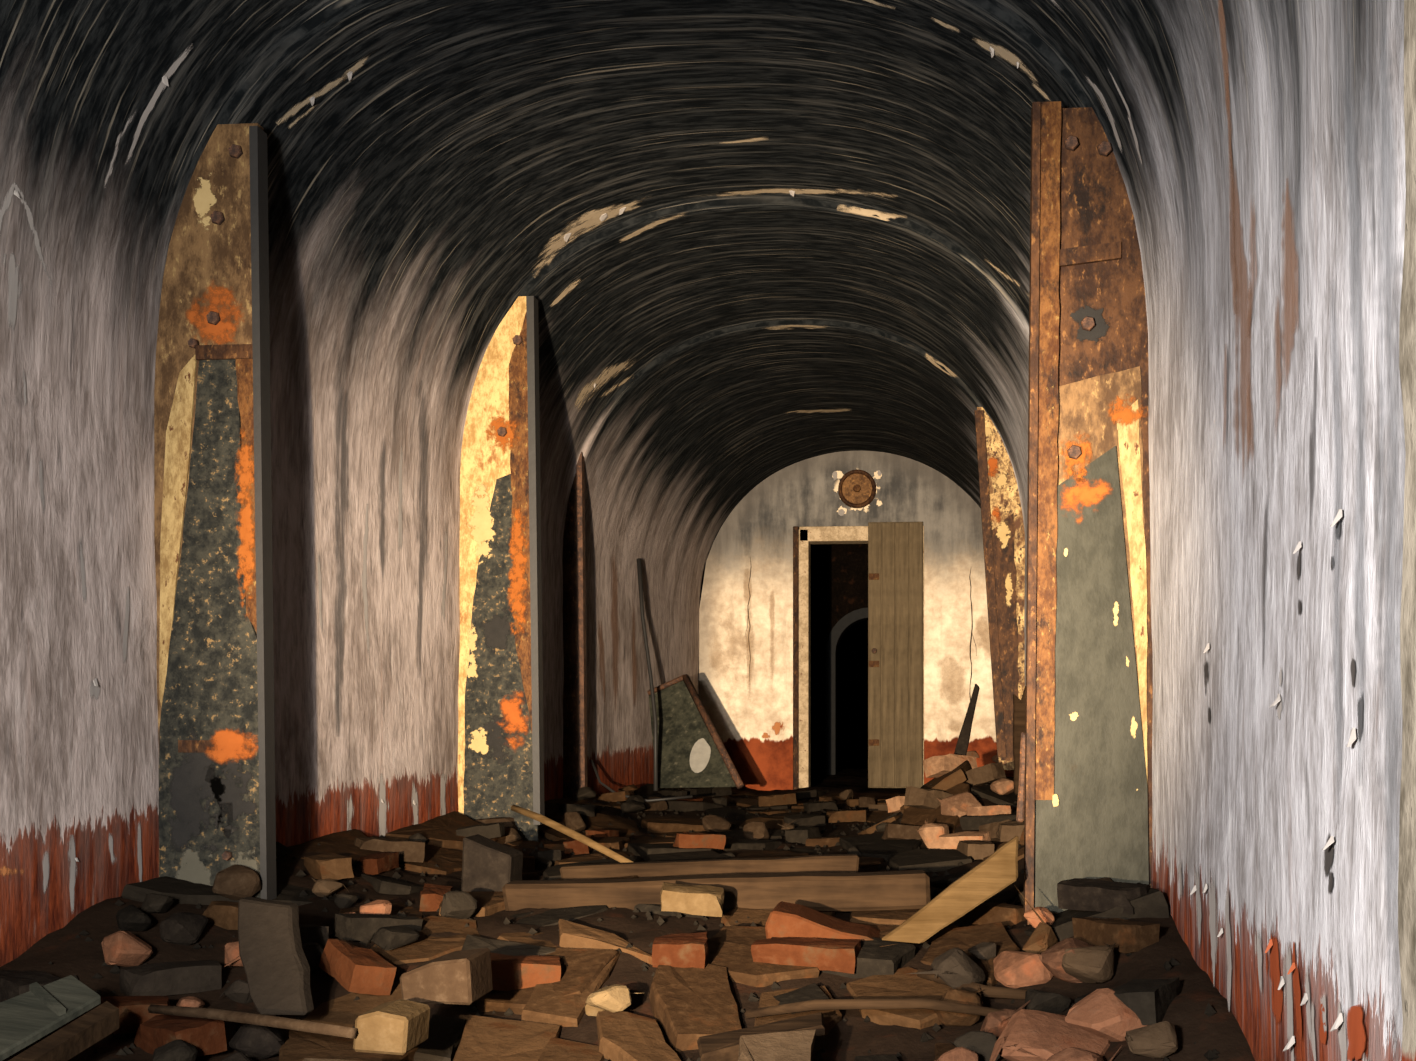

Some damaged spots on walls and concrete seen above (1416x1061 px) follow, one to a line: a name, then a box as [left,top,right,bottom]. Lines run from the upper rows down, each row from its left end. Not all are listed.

spalling [977,39,1049,100]
spalling [536,201,639,272]
spalling [621,215,682,241]
spalling [720,189,905,221]
rust [187,286,241,345]
spalling [551,279,580,306]
spalling [574,361,632,411]
rust [1108,396,1143,425]
rust [988,457,998,477]
rust [1061,435,1110,522]
rust [236,432,255,607]
rust [207,729,258,763]